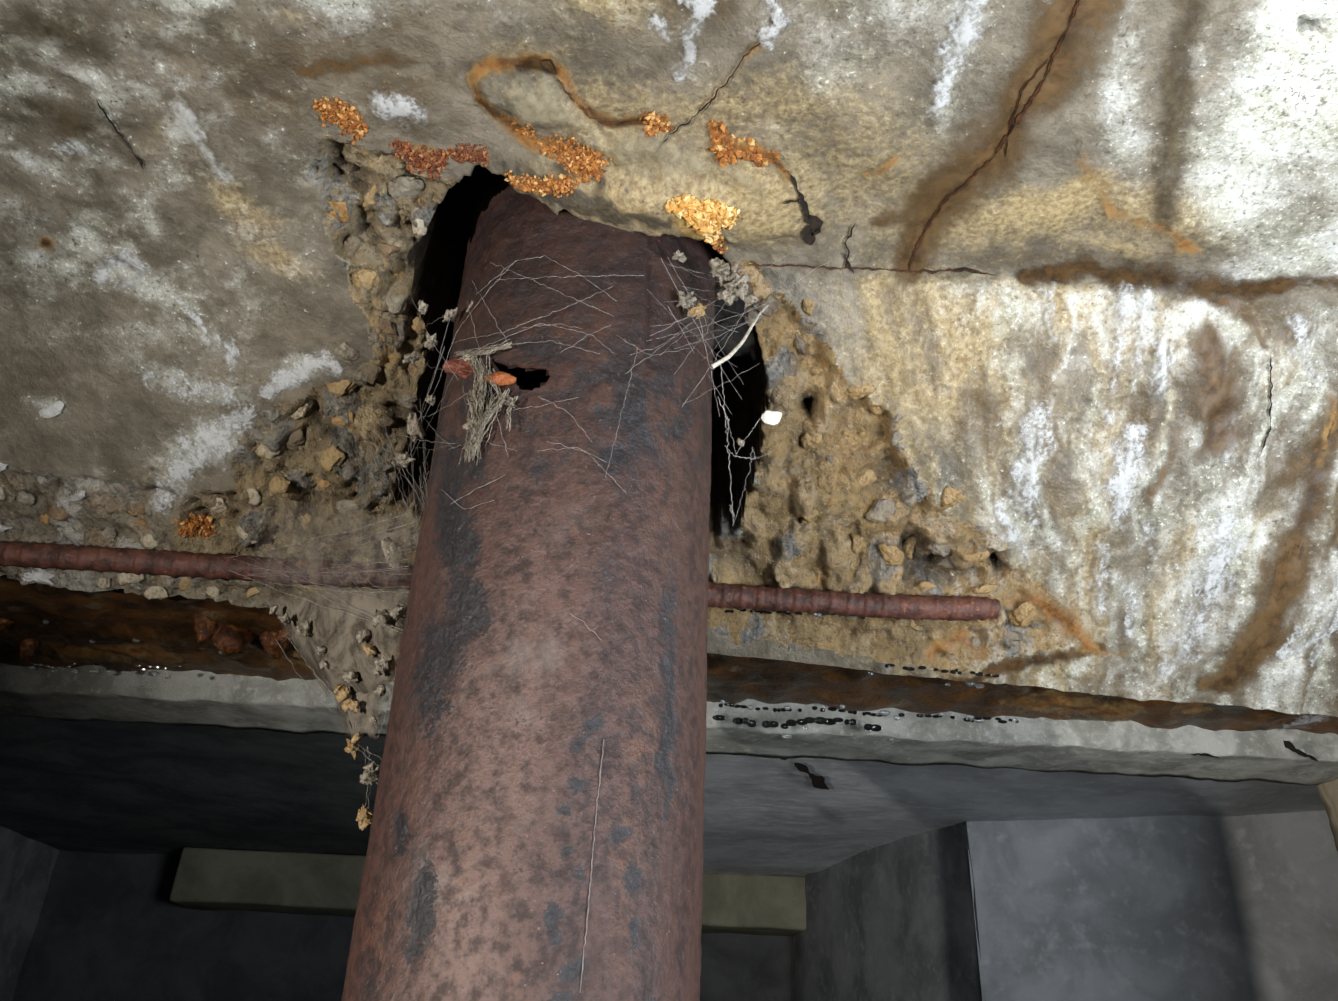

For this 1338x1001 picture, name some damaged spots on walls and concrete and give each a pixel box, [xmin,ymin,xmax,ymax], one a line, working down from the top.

corrosion [468,53,675,198]
water stain [651,0,716,81]
crack [660,0,786,148]
corrosion [707,118,790,183]
crack [752,0,1080,275]
corrosion [664,194,740,254]
corrosion [442,357,516,386]
water stain [1110,287,1176,393]
spalling [707,249,1075,676]
water stain [995,403,1053,559]
water stain [1103,425,1147,526]
water stain [1161,513,1244,675]